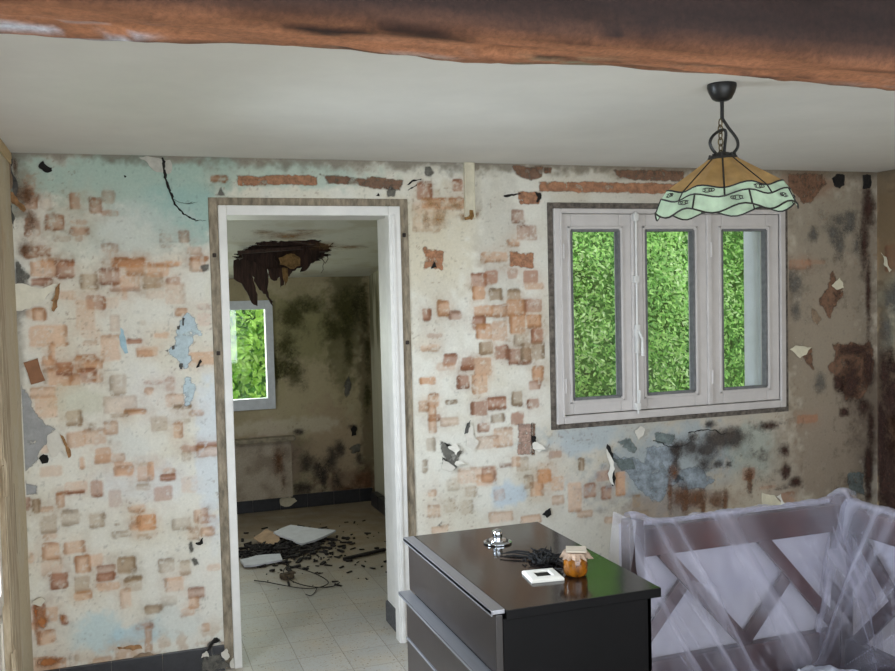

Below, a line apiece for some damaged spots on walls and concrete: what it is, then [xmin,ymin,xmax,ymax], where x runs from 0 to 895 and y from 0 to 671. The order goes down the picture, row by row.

crack [139,156,205,221]
spalling [232,239,333,306]
flaking render [423,247,444,270]
flaking render [510,251,534,269]
flaking render [811,271,844,324]
leakage [827,189,875,320]
leakage [274,288,368,382]
flaking render [21,358,71,471]
leakage [294,442,372,493]
flaking render [440,420,479,471]
peeling [606,426,715,502]
leakage [815,345,895,512]